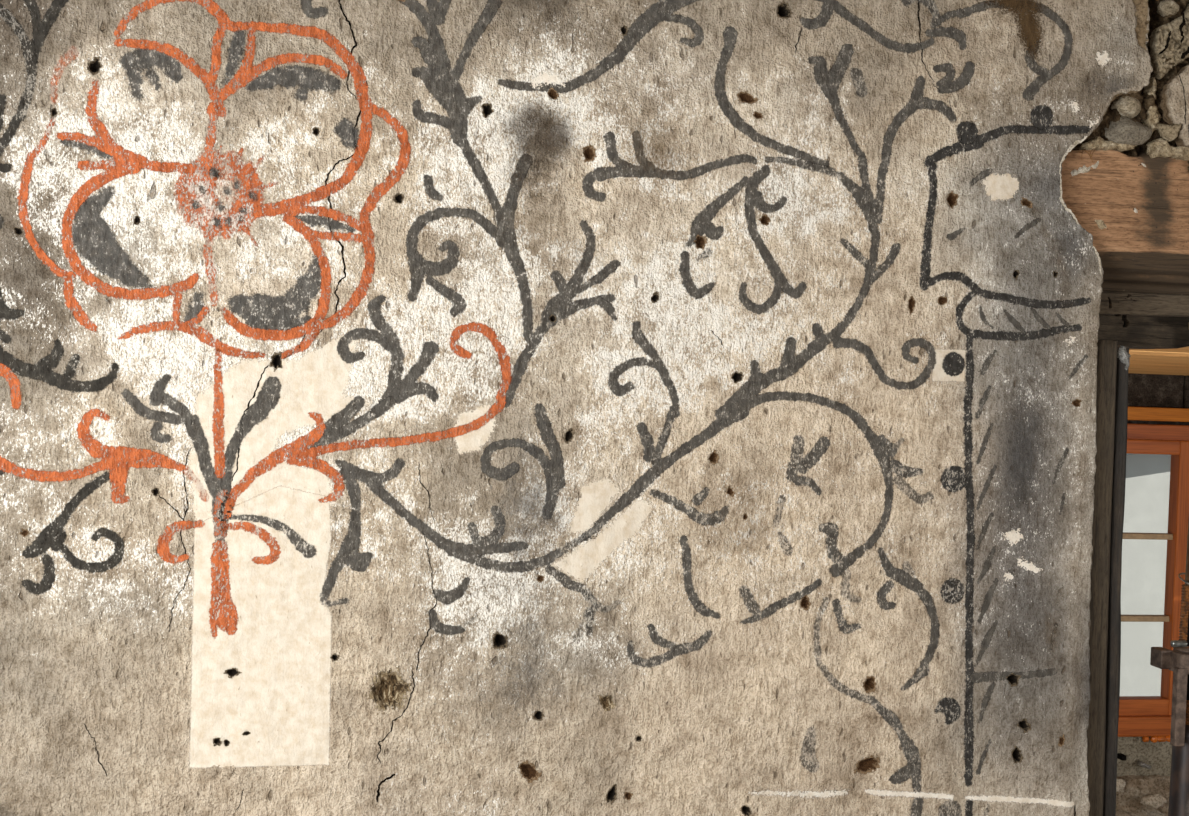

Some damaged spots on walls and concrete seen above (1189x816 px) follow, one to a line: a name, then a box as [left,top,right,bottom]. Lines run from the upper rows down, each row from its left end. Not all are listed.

peeling [1059,100,1100,225]
peeling [1095,50,1112,68]
peeling [1132,0,1149,50]
peeling [1125,92,1182,142]
crack [232,0,368,481]
crack [376,468,437,802]